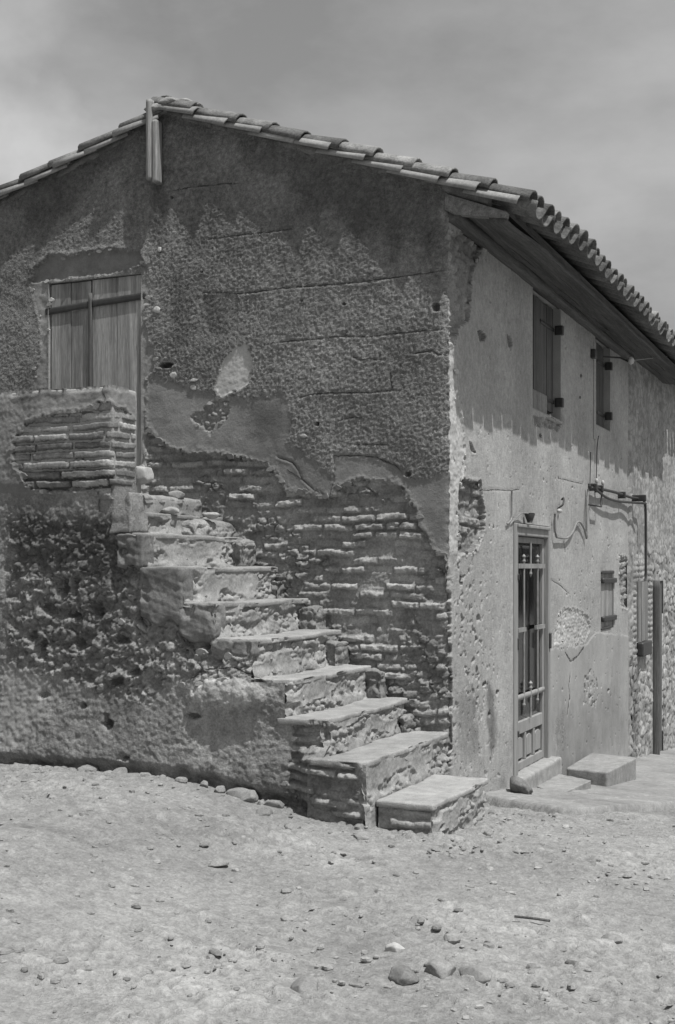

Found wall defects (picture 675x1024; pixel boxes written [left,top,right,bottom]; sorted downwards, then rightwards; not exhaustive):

crack [201,270,439,300]
crack [270,330,446,422]
spalling [0,226,487,821]
flaking render [554,607,591,645]